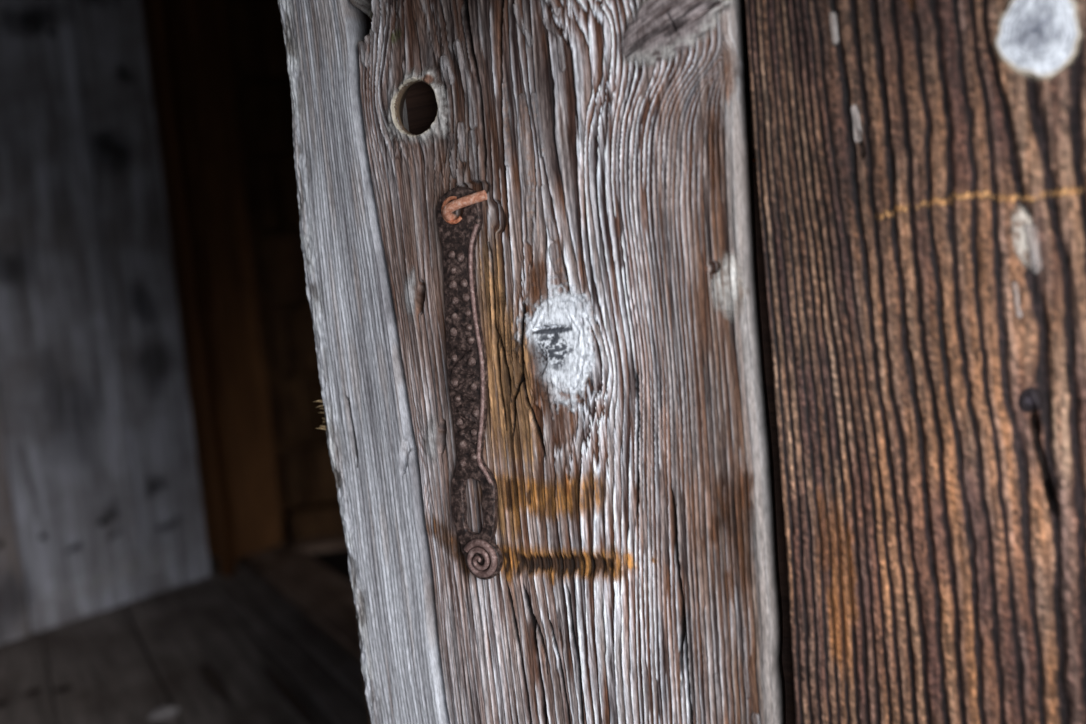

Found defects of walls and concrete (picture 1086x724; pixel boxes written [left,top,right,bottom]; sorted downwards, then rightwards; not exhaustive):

crack [464,0,487,182]
crack [489,201,546,459]
corrosion [483,246,634,585]